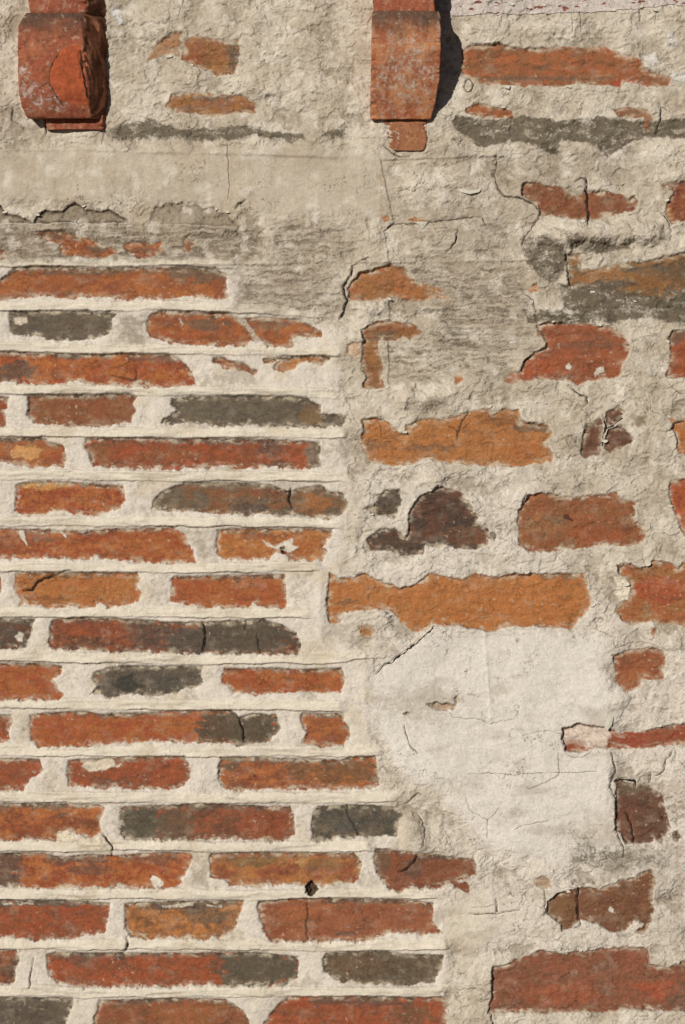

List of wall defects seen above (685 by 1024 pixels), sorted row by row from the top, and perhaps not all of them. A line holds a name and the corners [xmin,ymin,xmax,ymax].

spalling [457,38,674,91]
spalling [0,199,131,226]
spalling [147,199,239,230]
crack [385,216,486,249]
crack [493,156,540,254]
crack [340,257,368,319]
spalling [344,261,454,306]
spalling [346,317,426,394]
spalling [499,319,633,388]
spalling [358,405,556,470]
spalling [322,484,598,638]
spalling [485,866,685,1018]